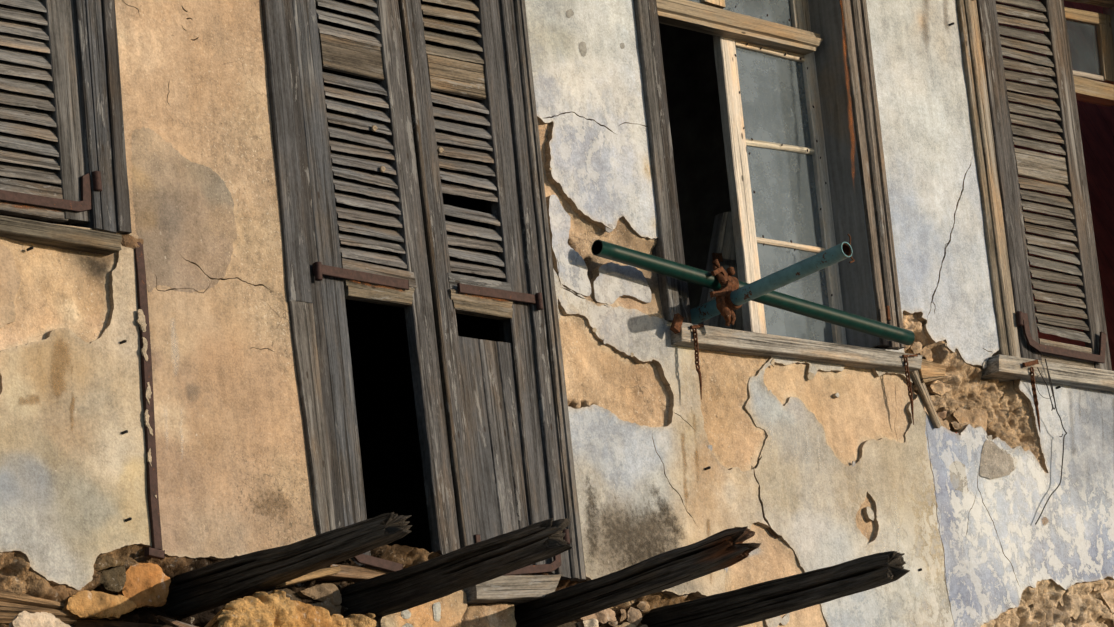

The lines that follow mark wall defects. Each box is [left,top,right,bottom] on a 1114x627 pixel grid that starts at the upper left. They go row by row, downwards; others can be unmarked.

flaking render [538,121,665,320]
flaking render [0,236,116,351]
flaking render [558,308,670,427]
flaking render [698,313,1047,473]
leakage [587,488,680,565]
flaking render [724,523,803,592]
flaking render [856,495,875,546]
flaking render [739,604,827,627]
flaking render [981,578,1114,627]